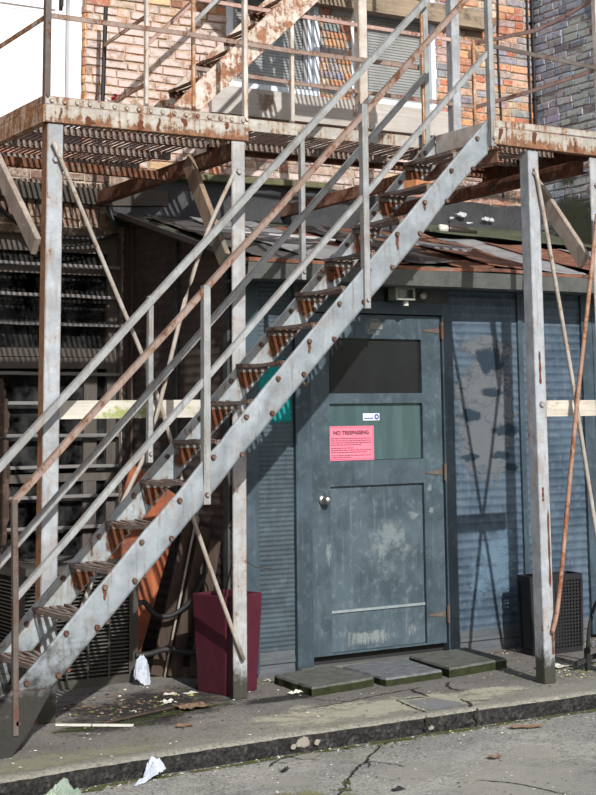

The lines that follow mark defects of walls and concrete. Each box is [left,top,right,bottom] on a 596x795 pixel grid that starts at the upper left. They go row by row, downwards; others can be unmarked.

rust [296,297,316,318]
rust [267,336,290,357]
rust [237,372,261,389]
rust [211,410,230,432]
peeling [453,335,520,488]
rust [174,448,198,467]
crack [331,740,403,795]